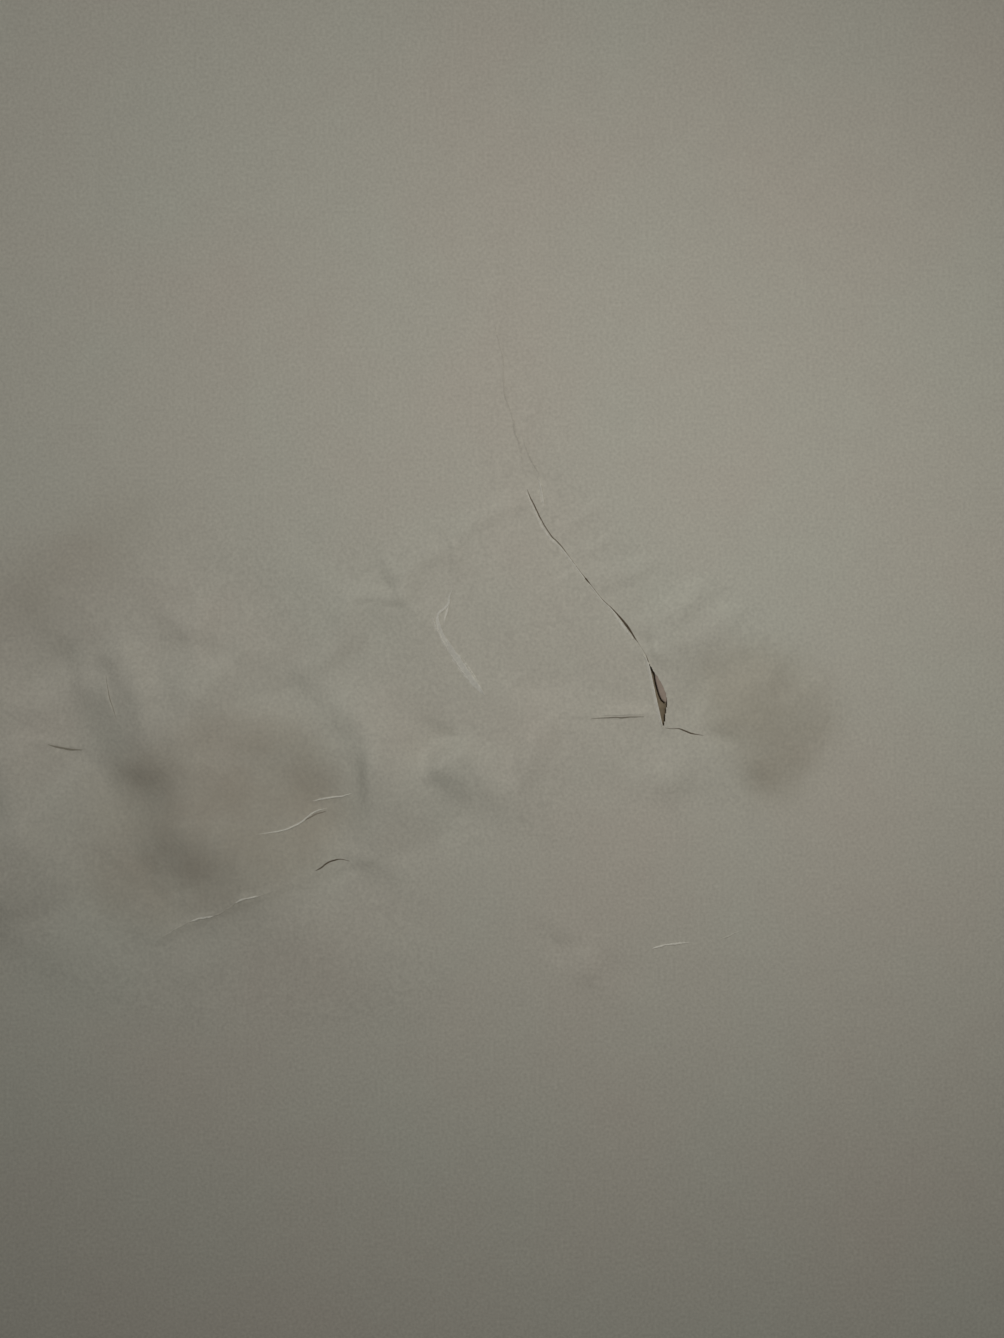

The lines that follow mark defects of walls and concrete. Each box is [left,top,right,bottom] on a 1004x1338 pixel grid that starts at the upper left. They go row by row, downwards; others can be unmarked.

crack [256,793,352,835]